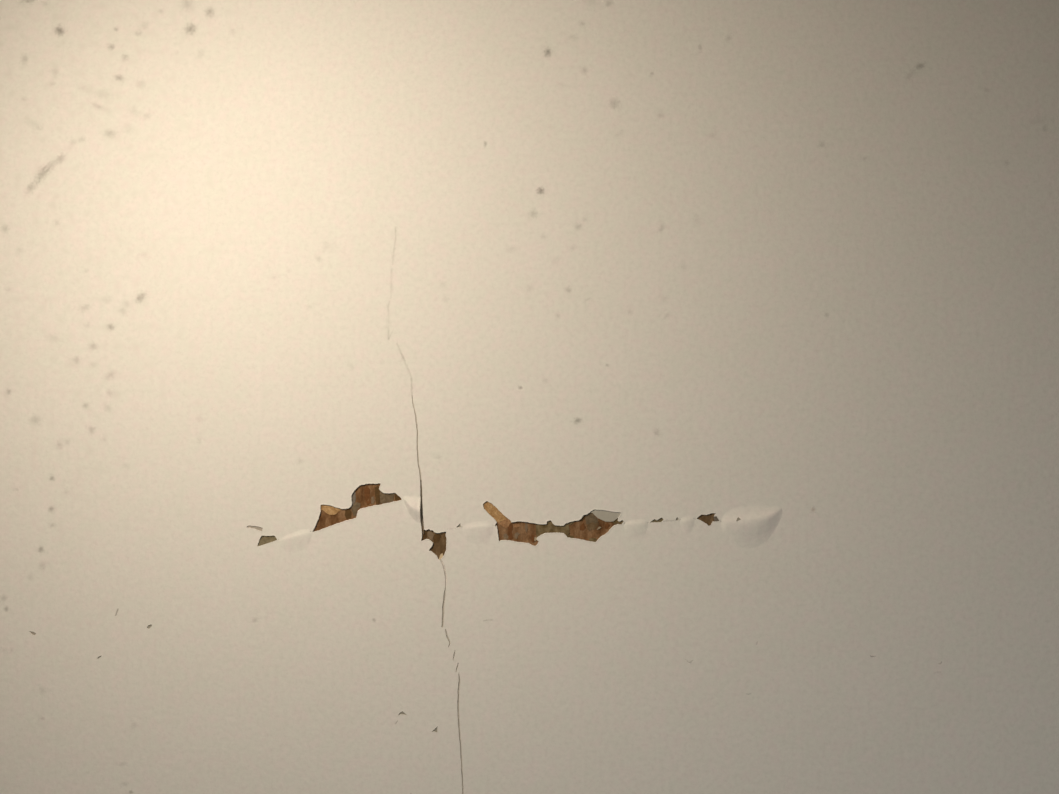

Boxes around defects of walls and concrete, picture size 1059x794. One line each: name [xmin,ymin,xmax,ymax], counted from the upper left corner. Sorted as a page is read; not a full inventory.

peeling [245,525,278,547]
crack [412,397,424,534]
peeling [695,512,720,527]
crack [440,559,464,794]